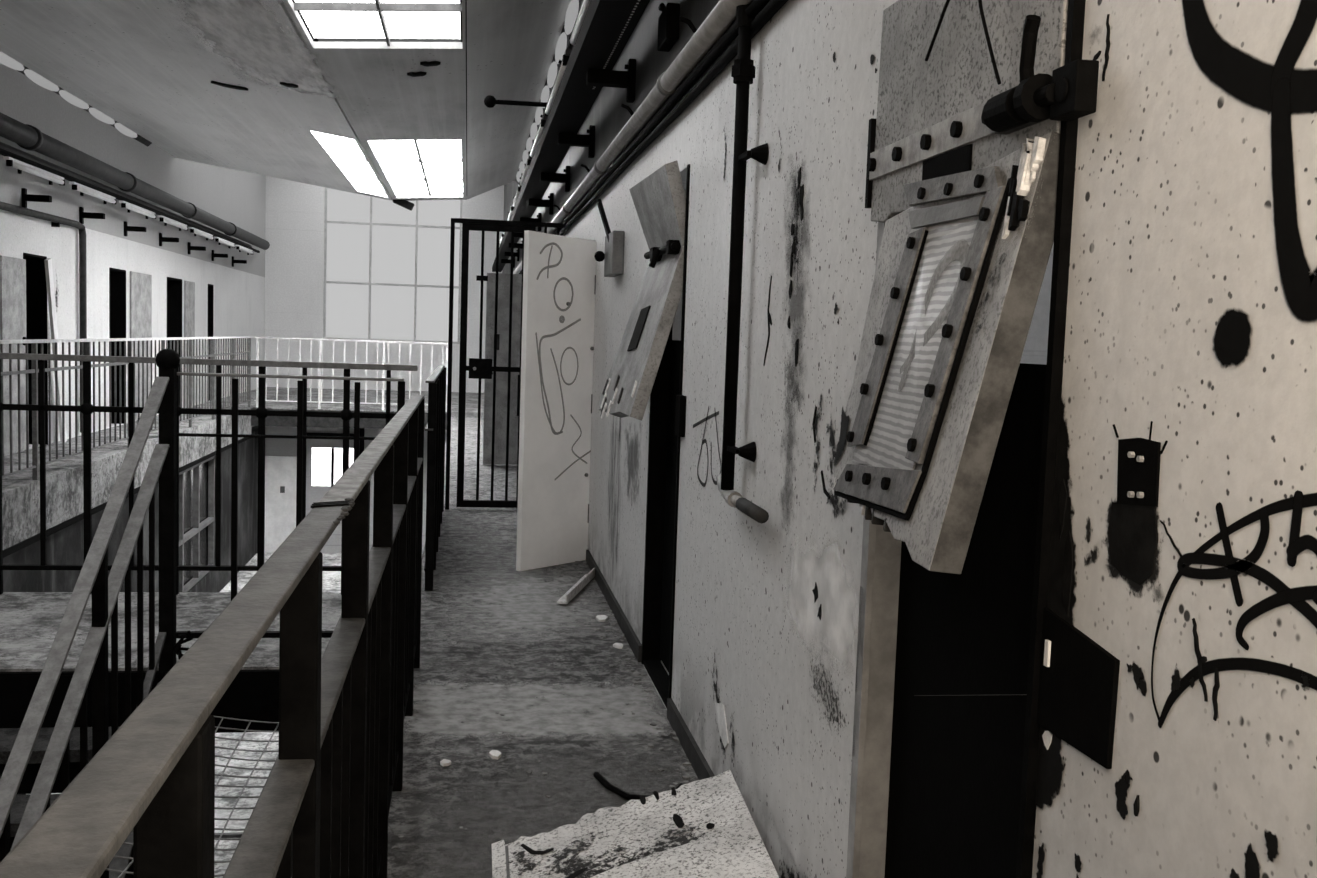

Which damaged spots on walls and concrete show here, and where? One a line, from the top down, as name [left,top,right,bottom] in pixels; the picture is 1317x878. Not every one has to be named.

damp [190,0,325,93]
damp [787,167,808,464]